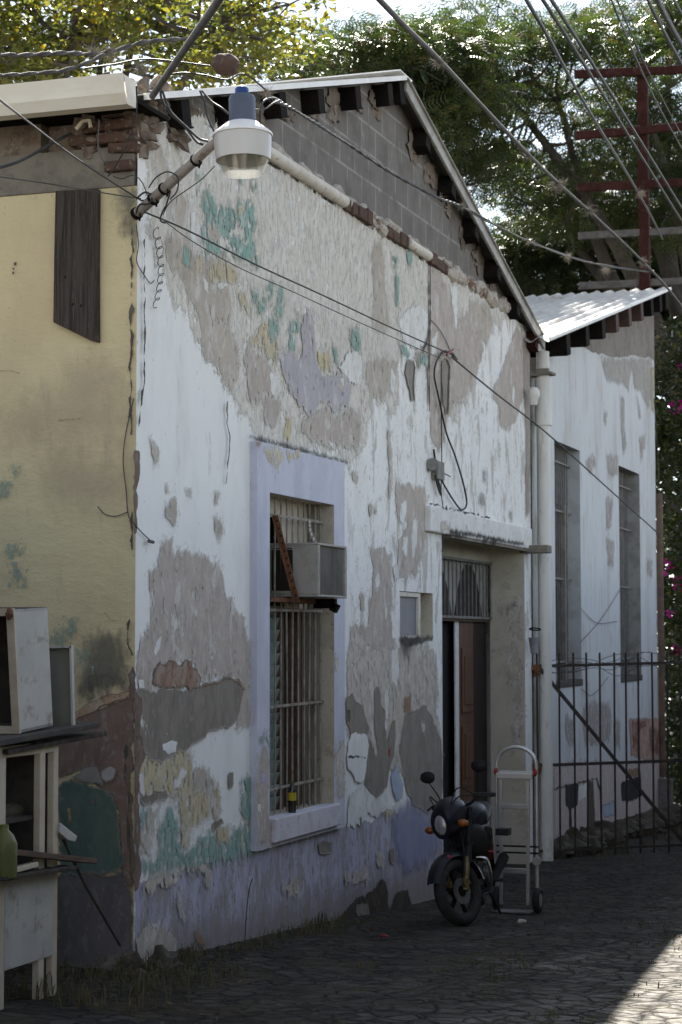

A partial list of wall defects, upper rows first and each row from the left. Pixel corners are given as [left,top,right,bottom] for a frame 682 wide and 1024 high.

peeling [151,135,494,472]
peeling [493,325,525,431]
water stain [79,634,124,695]
peeling [57,482,274,968]
peeling [339,427,445,920]